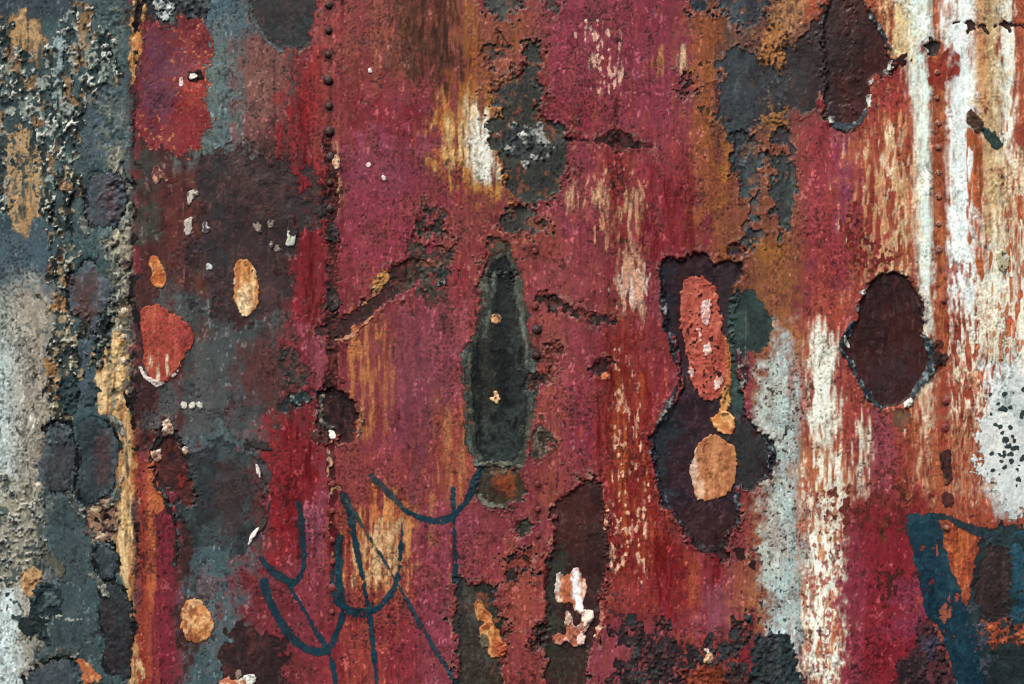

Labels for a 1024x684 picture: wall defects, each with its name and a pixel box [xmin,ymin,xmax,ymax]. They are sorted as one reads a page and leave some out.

peeling [0,0,124,430]
peeling [443,0,913,684]
peeling [839,271,949,432]
corrosion [824,40,1024,597]
peeling [0,475,82,646]
peeling [84,495,121,544]
peeling [76,659,102,684]